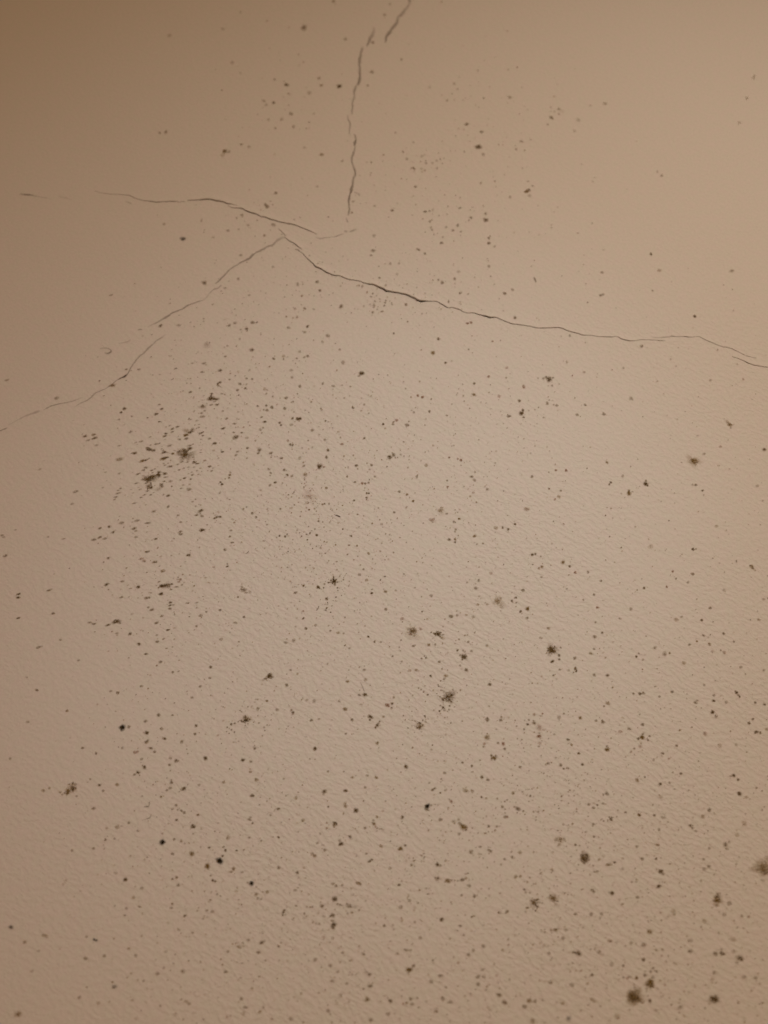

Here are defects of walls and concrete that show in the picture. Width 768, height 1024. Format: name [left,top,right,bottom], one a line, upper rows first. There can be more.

crack [95,183,768,367]
leakage [114,349,370,578]
leakage [94,538,221,702]
leakage [420,713,543,832]
leakage [541,737,655,877]
leakage [623,959,654,1002]